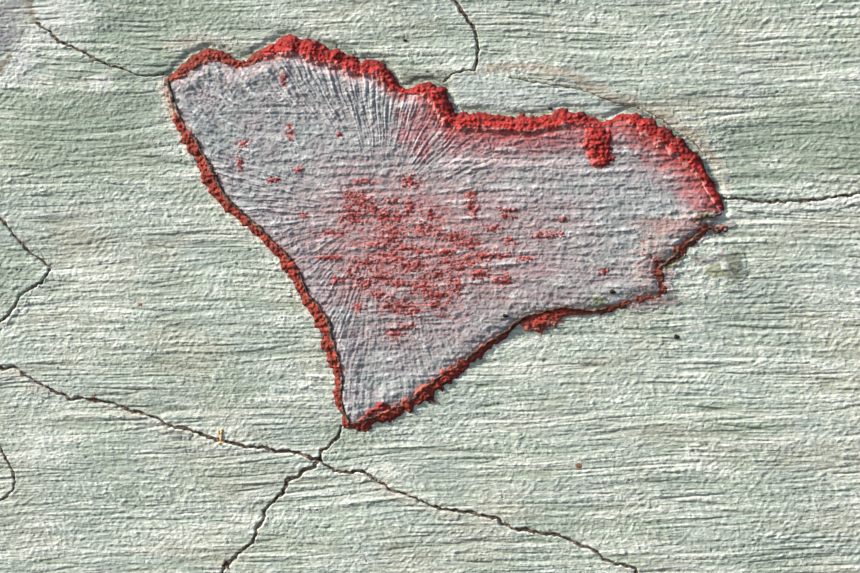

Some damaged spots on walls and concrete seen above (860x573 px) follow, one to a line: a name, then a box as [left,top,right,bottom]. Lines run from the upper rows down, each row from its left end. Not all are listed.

crack [38,23,165,77]
crack [445,0,480,82]
crack [507,77,703,153]
crack [723,192,860,215]
crack [0,217,51,323]
crack [0,365,638,573]